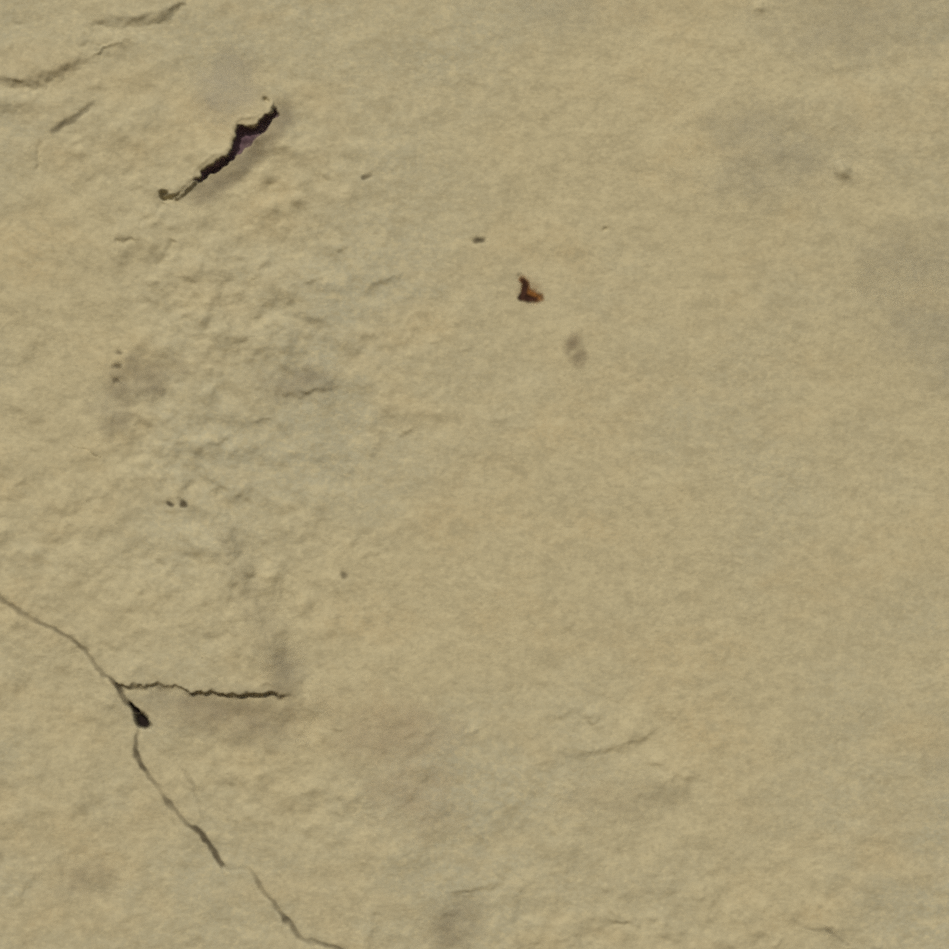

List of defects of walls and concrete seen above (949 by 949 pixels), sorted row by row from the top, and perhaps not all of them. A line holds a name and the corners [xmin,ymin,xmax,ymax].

flaking render [130,67,302,223]
rust [518,277,543,302]
spalling [99,616,321,760]
crack [191,826,223,865]